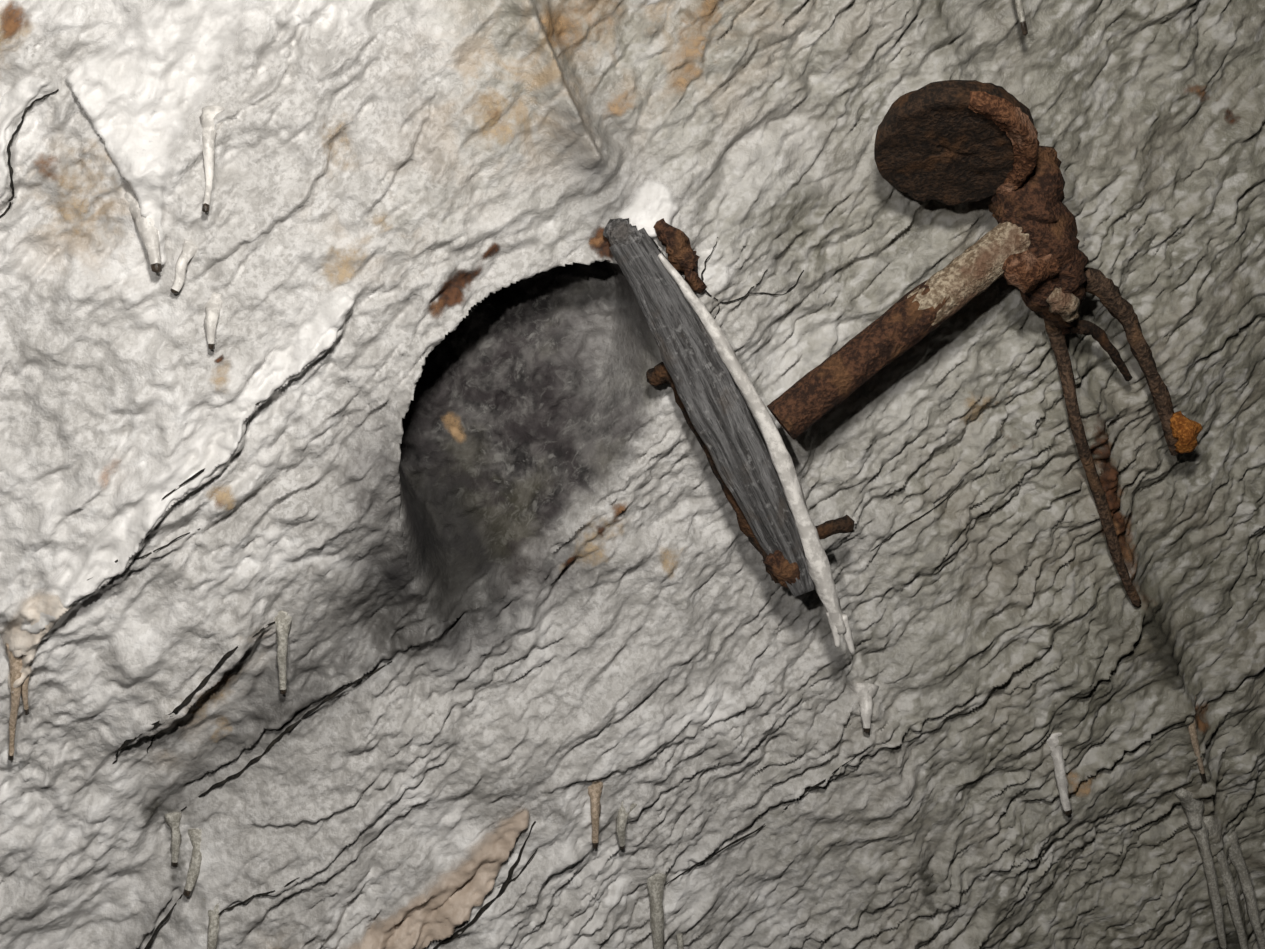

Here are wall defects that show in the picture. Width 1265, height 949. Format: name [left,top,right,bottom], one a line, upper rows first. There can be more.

corrosion [0,2,23,42]
crack [0,89,59,218]
corrosion [968,91,1040,198]
corrosion [429,243,499,313]
crack [161,468,205,500]
spalling [399,260,671,622]
corrosion [1090,426,1137,565]
crack [88,528,200,580]
crack [112,621,275,764]
crack [181,661,392,815]
corrosion [1142,616,1179,684]
damp [1215,931,1249,949]